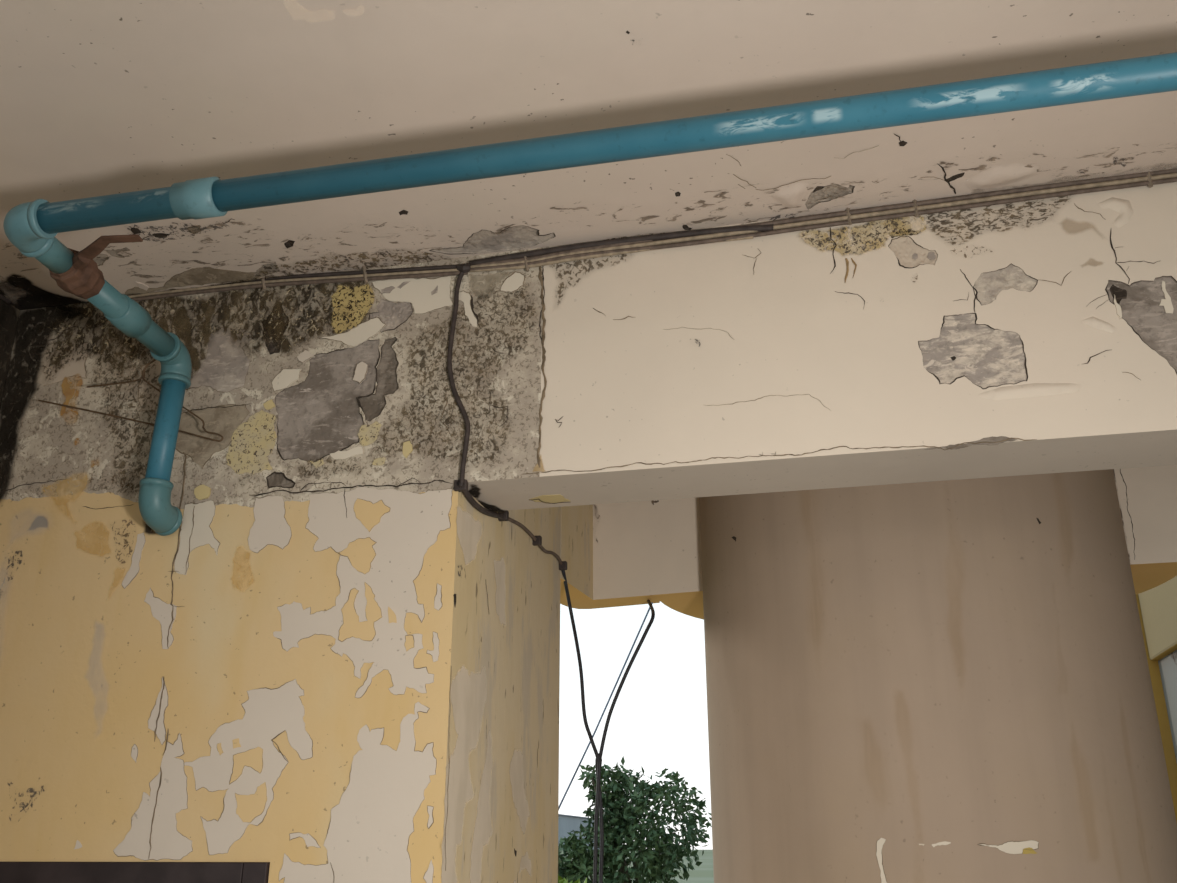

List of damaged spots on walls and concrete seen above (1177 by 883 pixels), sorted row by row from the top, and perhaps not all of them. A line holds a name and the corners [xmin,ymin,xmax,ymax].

flaking render [806,184,855,210]
flaking render [888,230,938,268]
peeling [34,343,88,386]
flaking render [175,306,290,468]
flaking render [248,276,477,553]
flaking render [918,263,1038,389]
flaking render [1105,276,1177,374]
peeling [174,500,220,575]
peeling [273,487,487,883]
crack [149,677,169,855]
peeling [113,676,313,861]
peeling [977,840,1039,854]